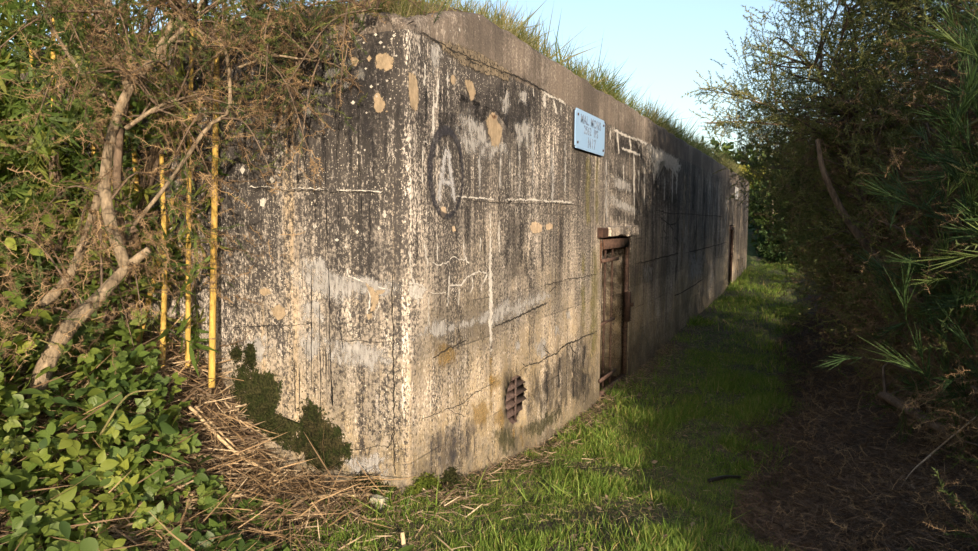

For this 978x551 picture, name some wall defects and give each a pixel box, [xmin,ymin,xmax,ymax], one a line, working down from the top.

spalling [350,53,394,71]
spalling [374,92,388,113]
spalling [408,73,419,111]
efflorescence [409,41,451,184]
spalling [486,112,502,149]
efflorescence [502,89,566,113]
efflorescence [455,115,534,193]
leakage [291,151,396,412]
leakage [408,213,551,354]
crack [493,274,596,328]
crack [433,328,466,358]
crack [520,331,597,371]